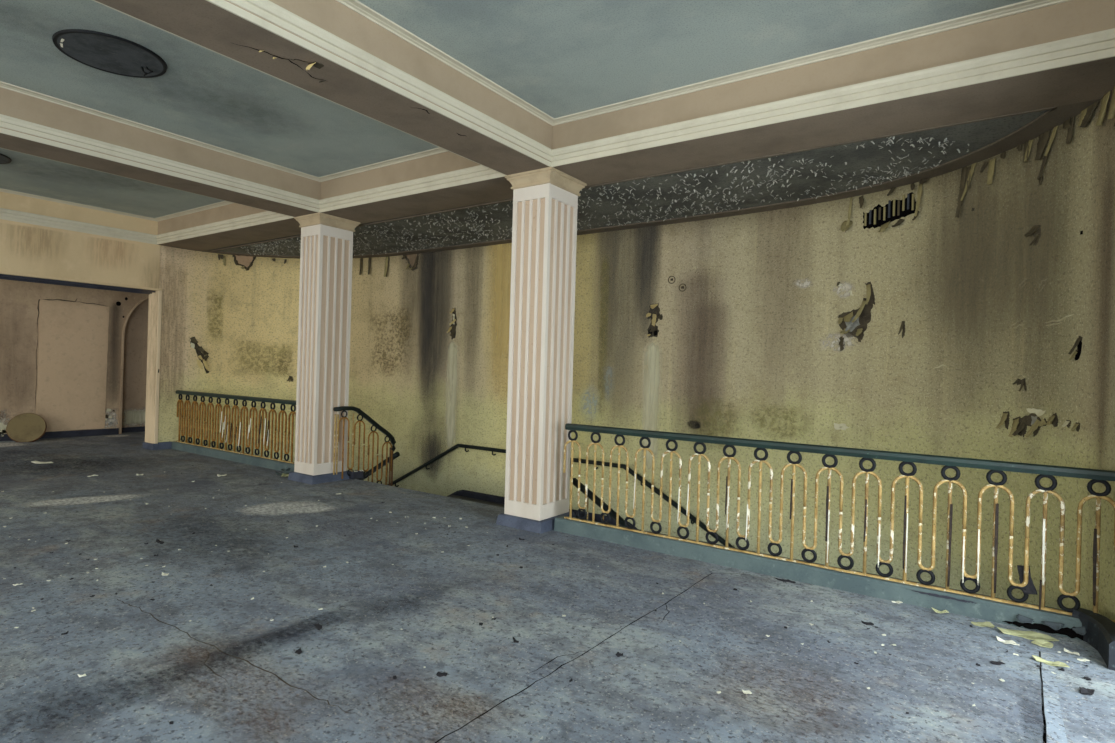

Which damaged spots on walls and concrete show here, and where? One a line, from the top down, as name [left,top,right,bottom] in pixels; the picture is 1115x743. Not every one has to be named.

crack [233,43,326,81]
flaking render [577,86,1115,232]
peeling [190,336,209,374]
damp [422,251,457,469]
damp [496,243,512,337]
damp [638,226,658,317]
damp [644,344,659,465]
peeling [646,303,663,338]
peeling [836,281,875,351]
peeling [995,408,1080,438]
crack [435,573,745,743]
crack [1039,651,1068,743]